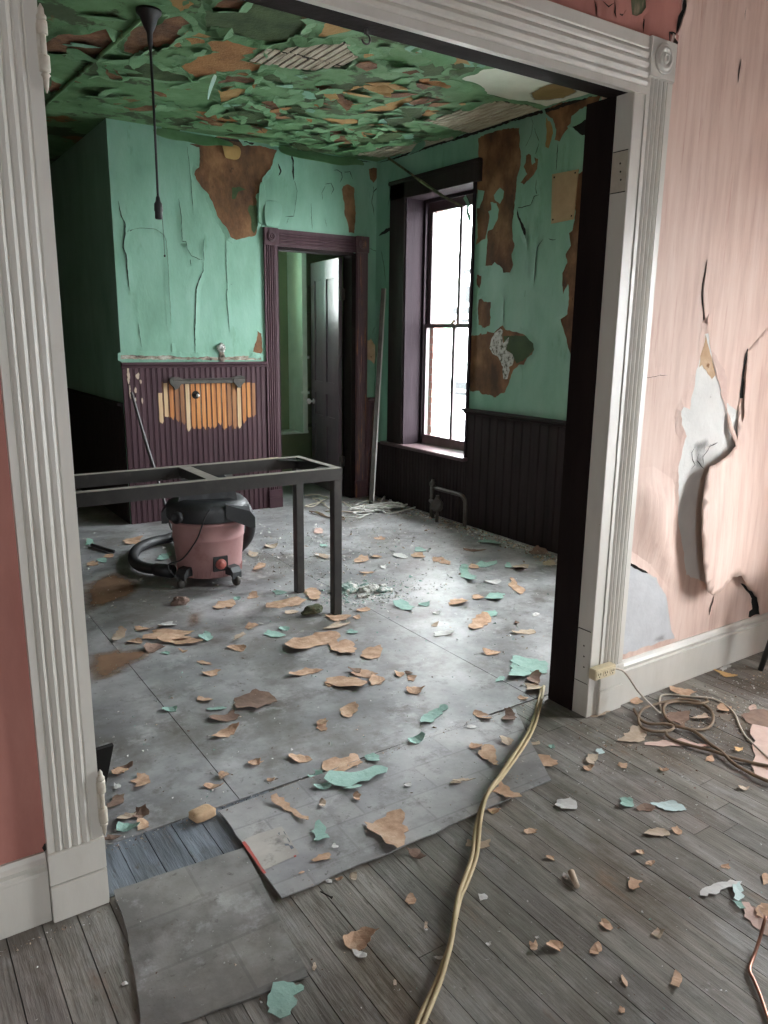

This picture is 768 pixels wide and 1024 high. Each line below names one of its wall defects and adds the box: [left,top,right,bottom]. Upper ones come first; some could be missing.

peeling [43,0,602,404]
crack [118,127,233,353]
crack [702,260,713,334]
peeling [158,383,256,432]
flaking render [622,566,678,660]
flaking render [739,578,760,619]
peeling [132,804,150,818]
peeling [271,793,329,841]
peeling [365,809,426,859]
peeling [492,781,522,798]
peeling [342,926,379,951]
peeling [266,981,304,1019]